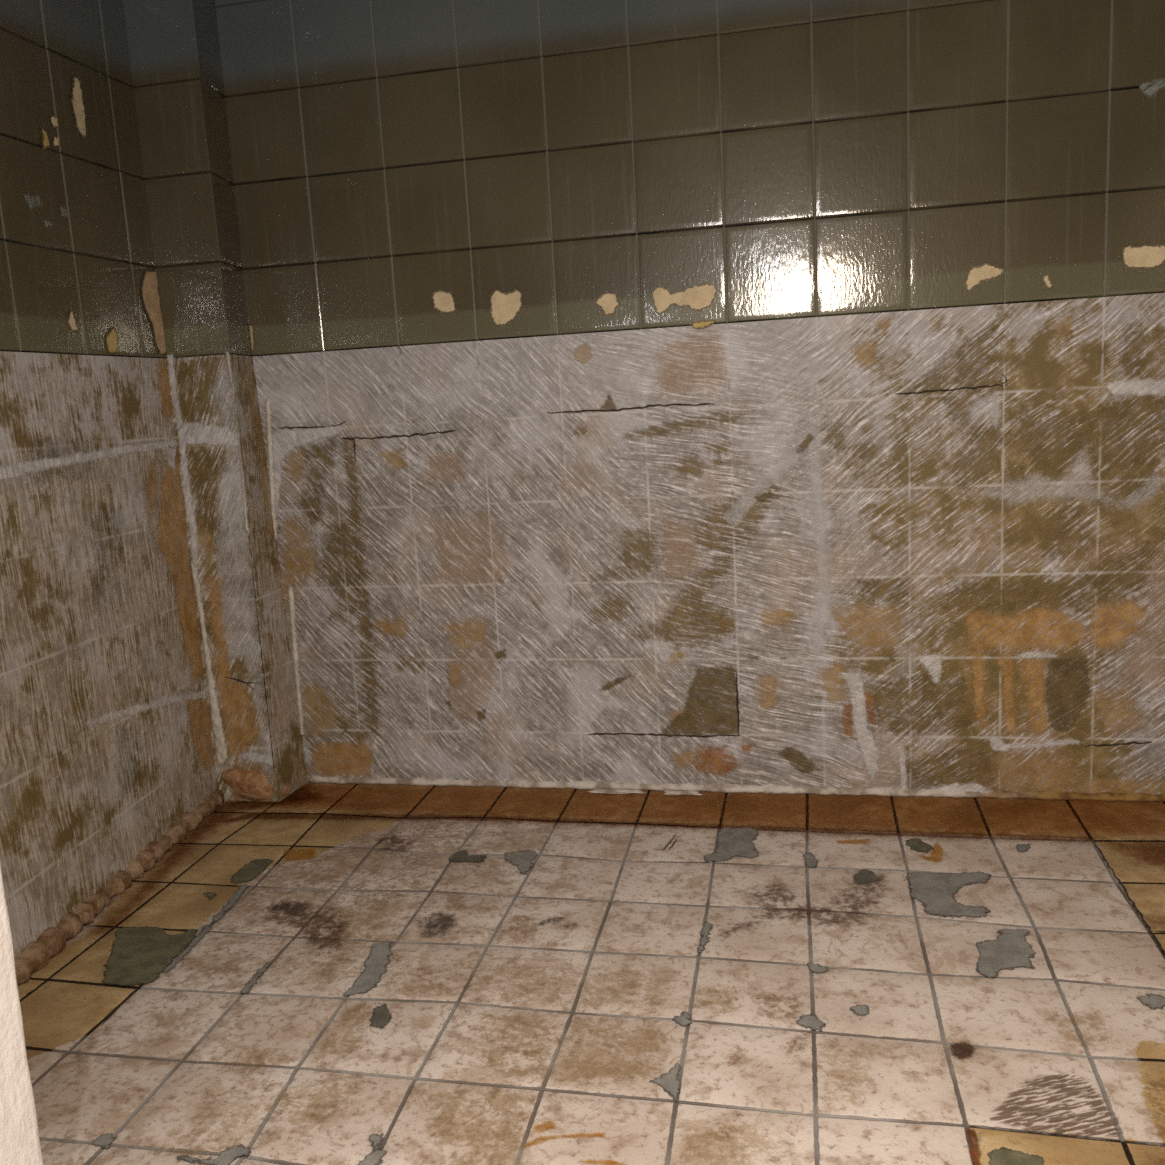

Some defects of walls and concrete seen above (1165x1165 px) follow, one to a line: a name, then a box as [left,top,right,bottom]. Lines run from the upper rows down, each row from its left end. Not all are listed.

peeling [965,263,1005,291]
peeling [1123,244,1165,269]
peeling [432,290,456,313]
peeling [490,289,522,326]
peeling [652,282,717,329]
water stain [248,535,275,770]
water stain [288,587,304,735]
water stain [899,750,907,789]
spalling [906,871,991,917]
spalling [101,859,273,986]
spalling [976,929,1036,978]
spalling [987,1147,1044,1165]